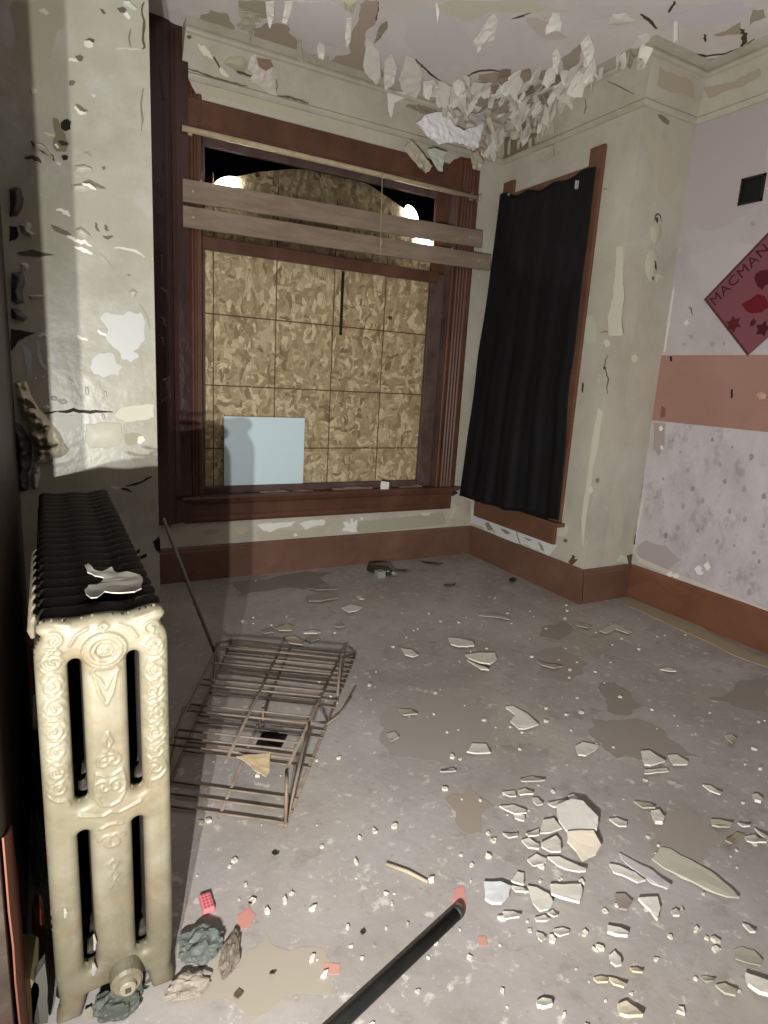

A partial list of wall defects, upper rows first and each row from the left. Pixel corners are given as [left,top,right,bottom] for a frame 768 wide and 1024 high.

peeling [199,0,297,96]
peeling [714,10,766,36]
peeling [317,0,653,173]
peeling [10,187,52,257]
peeling [11,271,34,351]
peeling [603,246,624,347]
crack [581,331,609,394]
peeling [15,381,69,491]
crack [44,407,113,415]
peeling [114,404,154,446]
flaking render [257,519,326,540]
peeling [342,517,363,532]